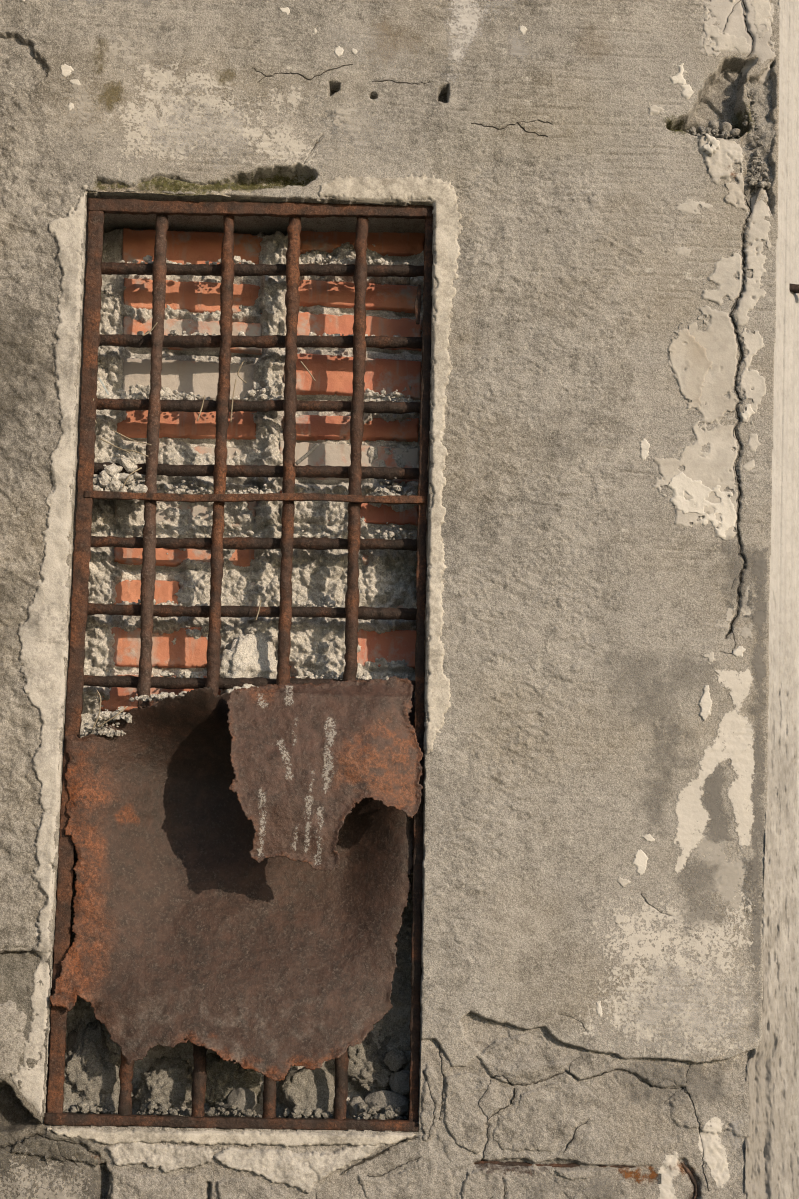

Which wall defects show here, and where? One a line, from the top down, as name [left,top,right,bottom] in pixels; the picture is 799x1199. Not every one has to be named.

water stain [51,33,376,191]
peeling [653,0,778,541]
crack [720,190,752,654]
peeling [705,585,754,638]
rust [49,676,423,1081]
spalling [0,668,760,1199]
crack [1,1134,98,1167]
crack [341,1045,444,1177]
crack [478,1016,708,1188]
rust [619,1166,658,1184]